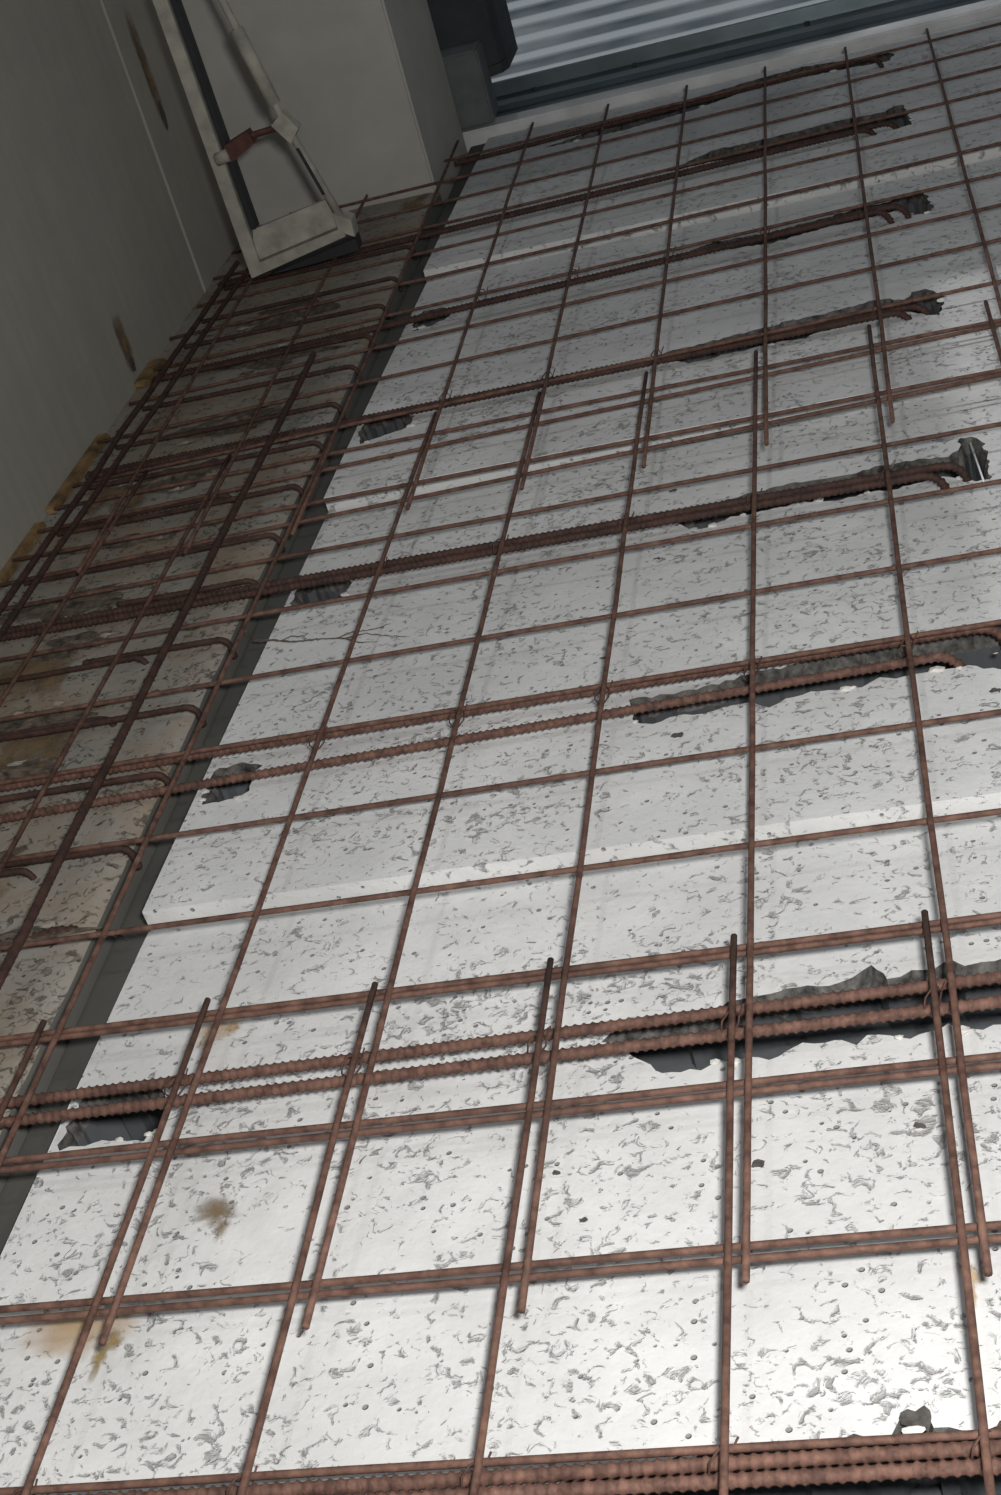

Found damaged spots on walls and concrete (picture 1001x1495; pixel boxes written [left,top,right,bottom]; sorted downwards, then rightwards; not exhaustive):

spalling [546,53,894,148]
spalling [667,105,914,172]
spalling [692,193,934,251]
spalling [666,289,947,364]
spalling [678,437,992,531]
spalling [629,625,1001,740]
spalling [200,762,263,805]
spalling [602,959,1001,1073]
spalling [57,1089,165,1151]
spalling [567,1405,1001,1495]